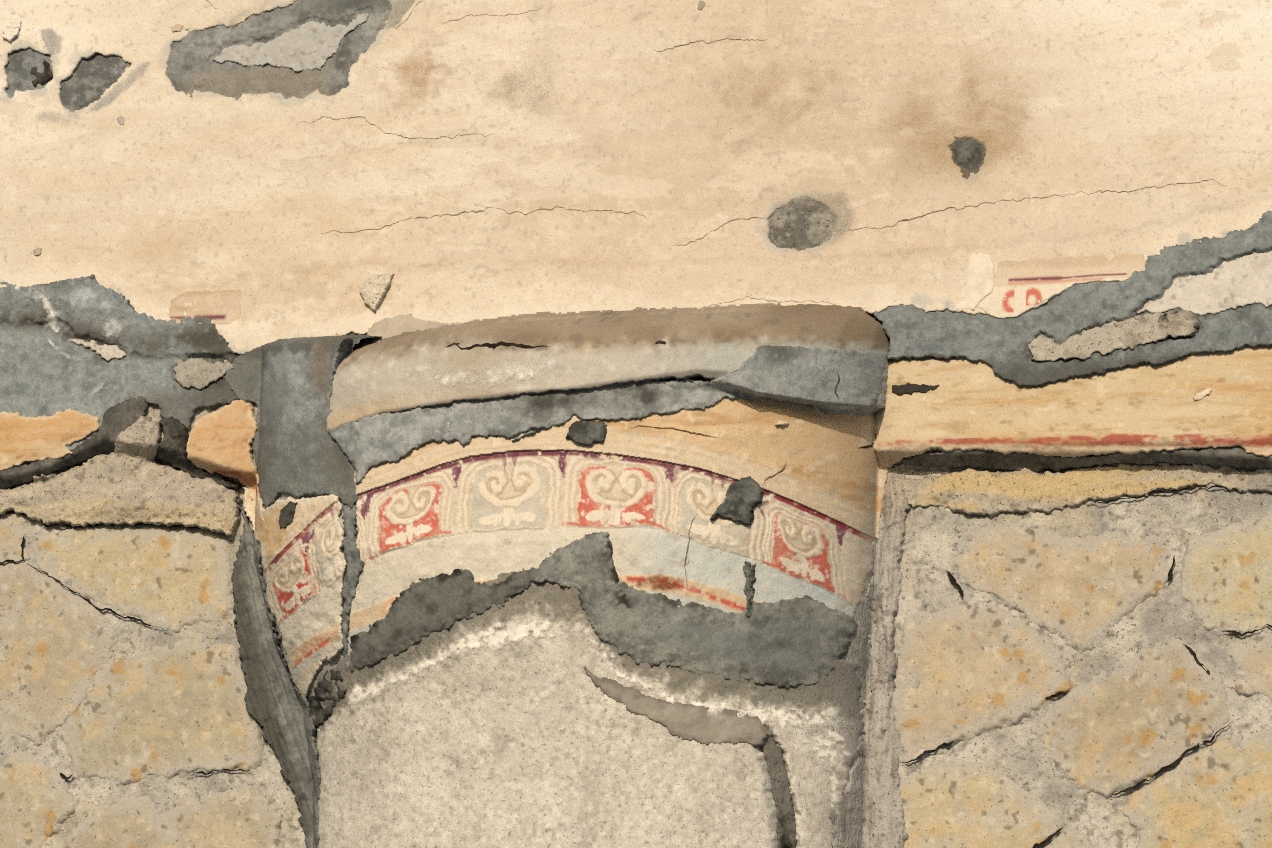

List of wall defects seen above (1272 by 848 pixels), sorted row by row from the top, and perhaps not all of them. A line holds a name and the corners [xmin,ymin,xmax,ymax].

flaking render [953,253,995,312]
flaking render [1028,251,1272,361]
flaking render [70,339,126,361]
flaking render [173,357,234,390]
spalling [308,669,346,727]